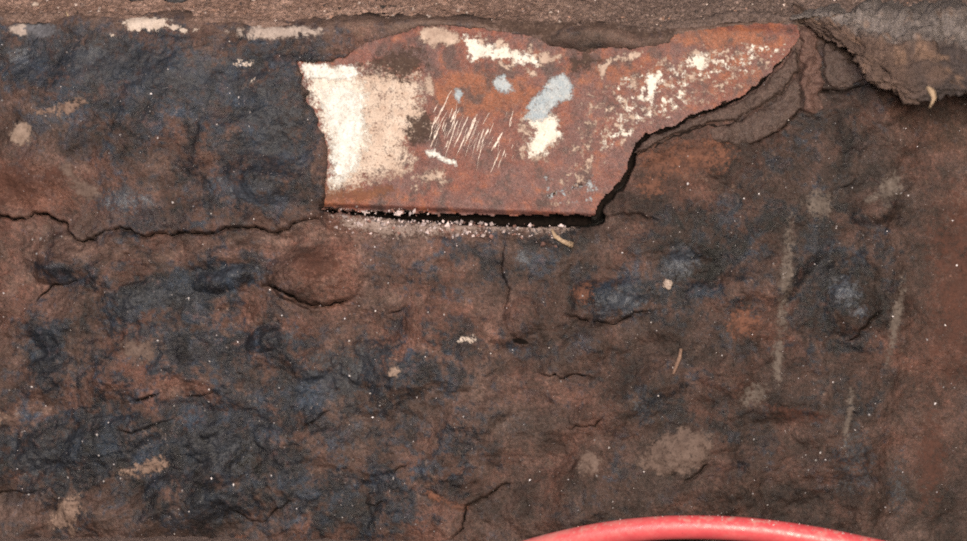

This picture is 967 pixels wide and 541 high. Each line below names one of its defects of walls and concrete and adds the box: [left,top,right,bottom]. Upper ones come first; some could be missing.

crack [0,59,783,309]
peeling [297,15,800,217]
rust [628,26,864,198]
crack [822,82,870,93]
crack [423,484,505,539]